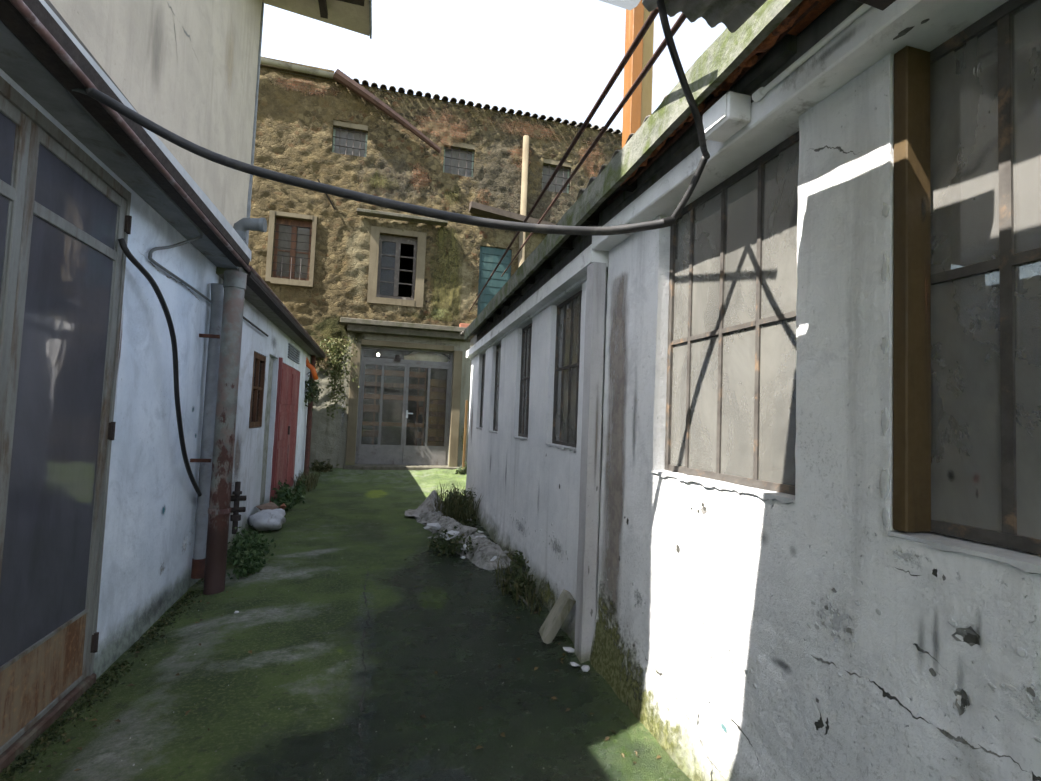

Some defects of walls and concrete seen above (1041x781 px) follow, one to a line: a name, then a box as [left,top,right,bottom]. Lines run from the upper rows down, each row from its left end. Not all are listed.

crack [810,145,864,154]
spalling [948,619,980,646]
spalling [951,684,970,716]
crack [811,655,1041,781]